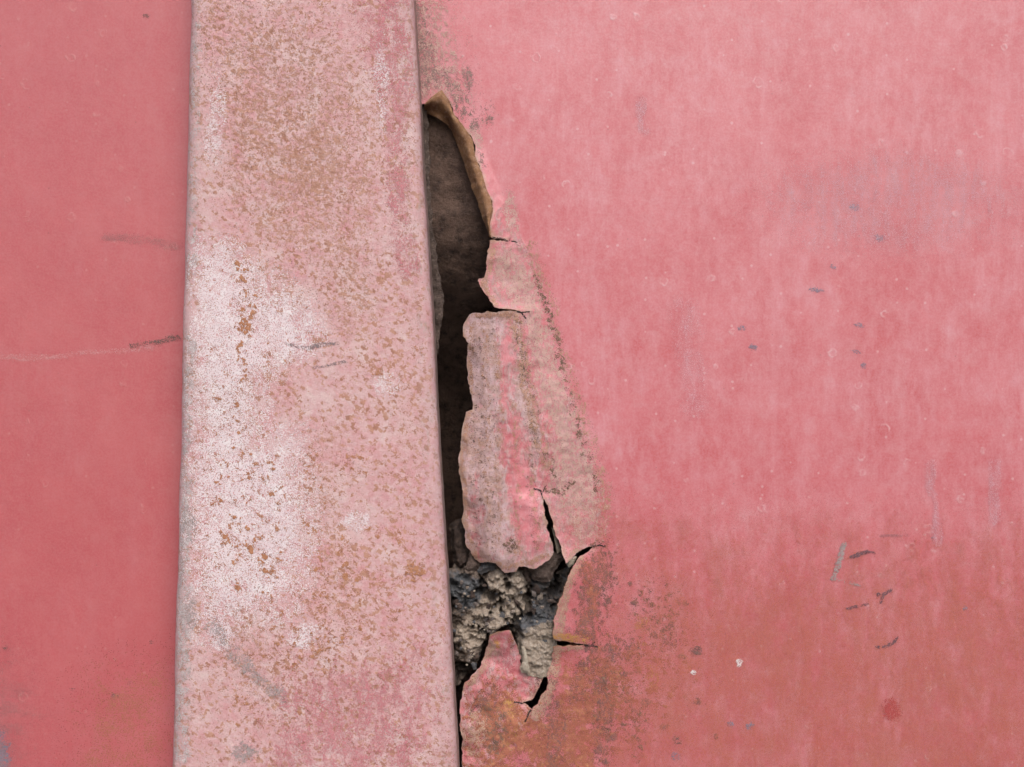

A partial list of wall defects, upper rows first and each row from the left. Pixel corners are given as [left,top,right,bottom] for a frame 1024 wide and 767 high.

corrosion [194,0,420,737]
peeling [486,191,612,552]
corrosion [460,239,702,767]
corrosion [404,560,426,582]
peeling [466,640,515,686]
peeling [529,647,583,721]
peeling [462,709,489,767]